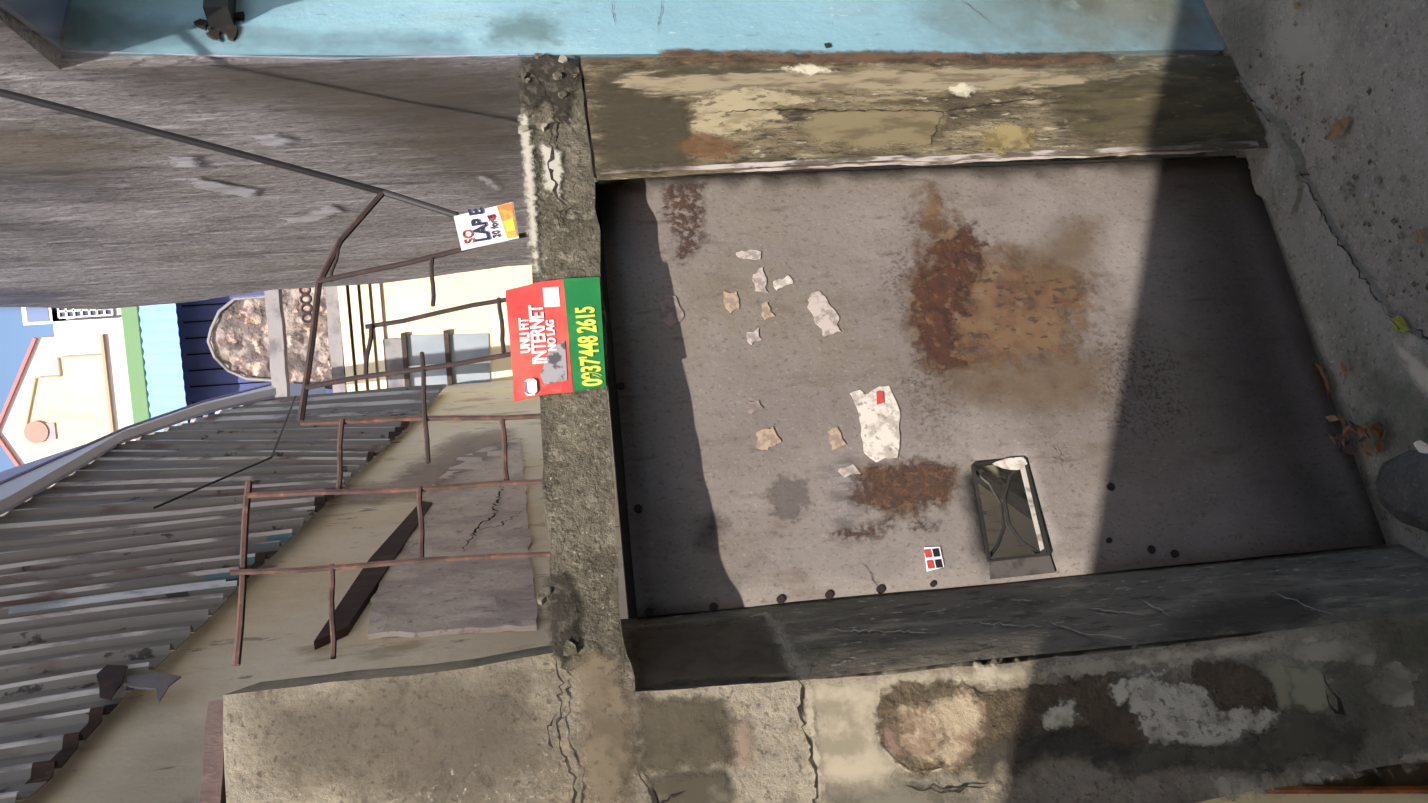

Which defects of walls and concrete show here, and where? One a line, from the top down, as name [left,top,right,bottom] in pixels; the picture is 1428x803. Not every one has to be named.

peeling [613,49,1114,149]
rust [663,184,706,259]
rust [901,183,1093,403]
crack [1300,173,1428,340]
crack [547,656,577,803]
crack [637,767,684,803]
crack [774,629,824,803]
spalling [808,631,1422,803]